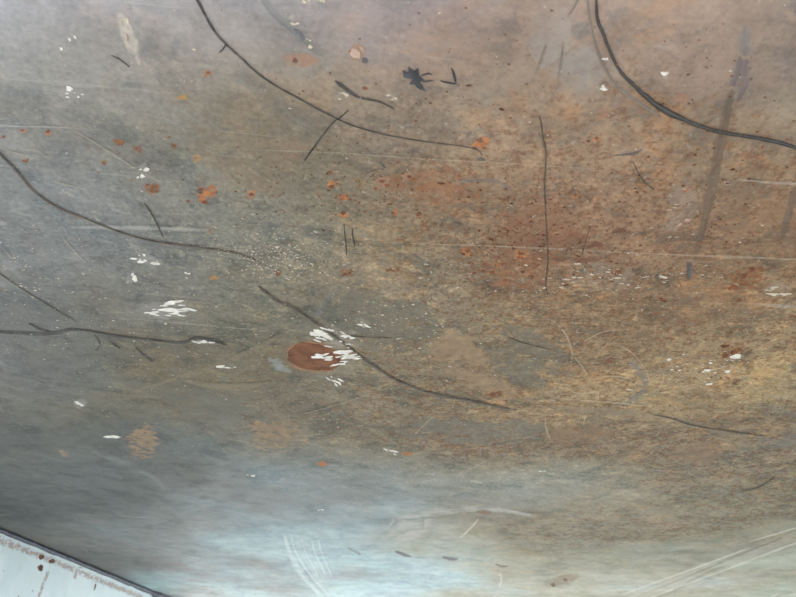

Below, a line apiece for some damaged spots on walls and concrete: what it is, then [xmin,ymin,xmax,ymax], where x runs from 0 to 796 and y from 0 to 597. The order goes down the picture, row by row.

crack [196,0,482,161]
crack [567,0,796,150]
crack [0,152,259,263]
corrosion [144,183,161,196]
corrosion [167,117,352,204]
crack [343,224,355,255]
crack [539,115,549,294]
leakage [682,23,754,281]
crack [0,274,227,362]
corrosion [267,341,342,375]
crack [259,287,516,411]
corrosion [0,535,143,597]